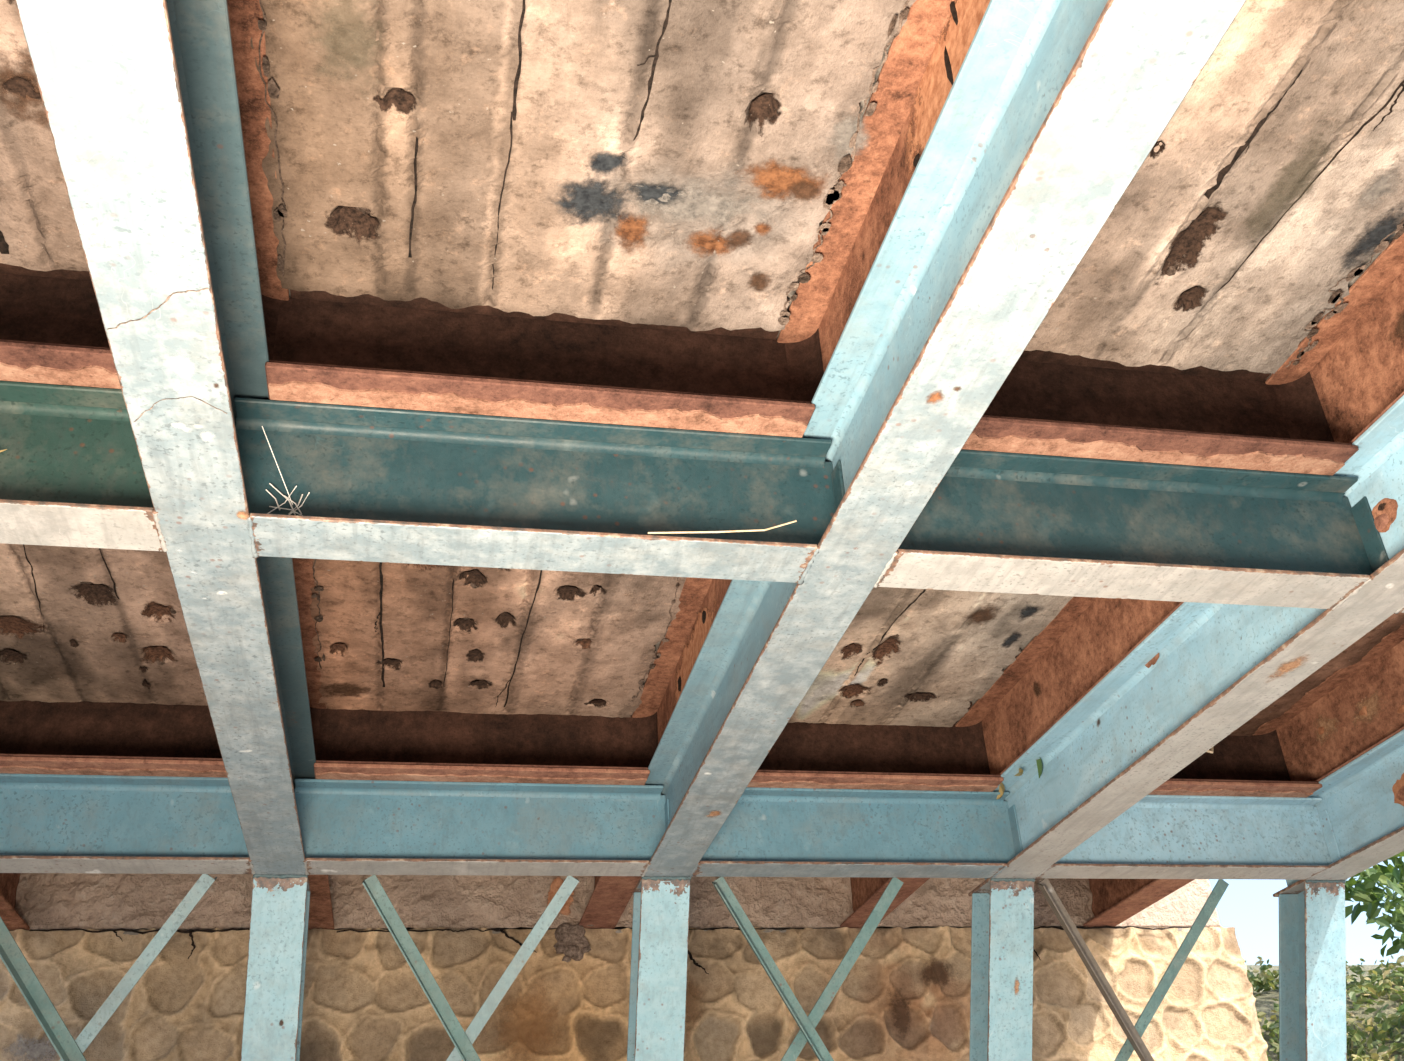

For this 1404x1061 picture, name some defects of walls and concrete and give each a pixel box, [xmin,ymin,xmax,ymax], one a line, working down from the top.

crack [633,0,672,141]
spalling [325,206,379,242]
crack [492,0,525,289]
leakage [556,153,681,224]
rust [690,224,770,254]
spalling [746,93,781,137]
rust [751,161,824,199]
spalling [1155,202,1228,285]
crack [1204,70,1303,199]
crack [1213,80,1404,296]
spalling [1173,286,1208,312]
rust [1392,773,1404,806]